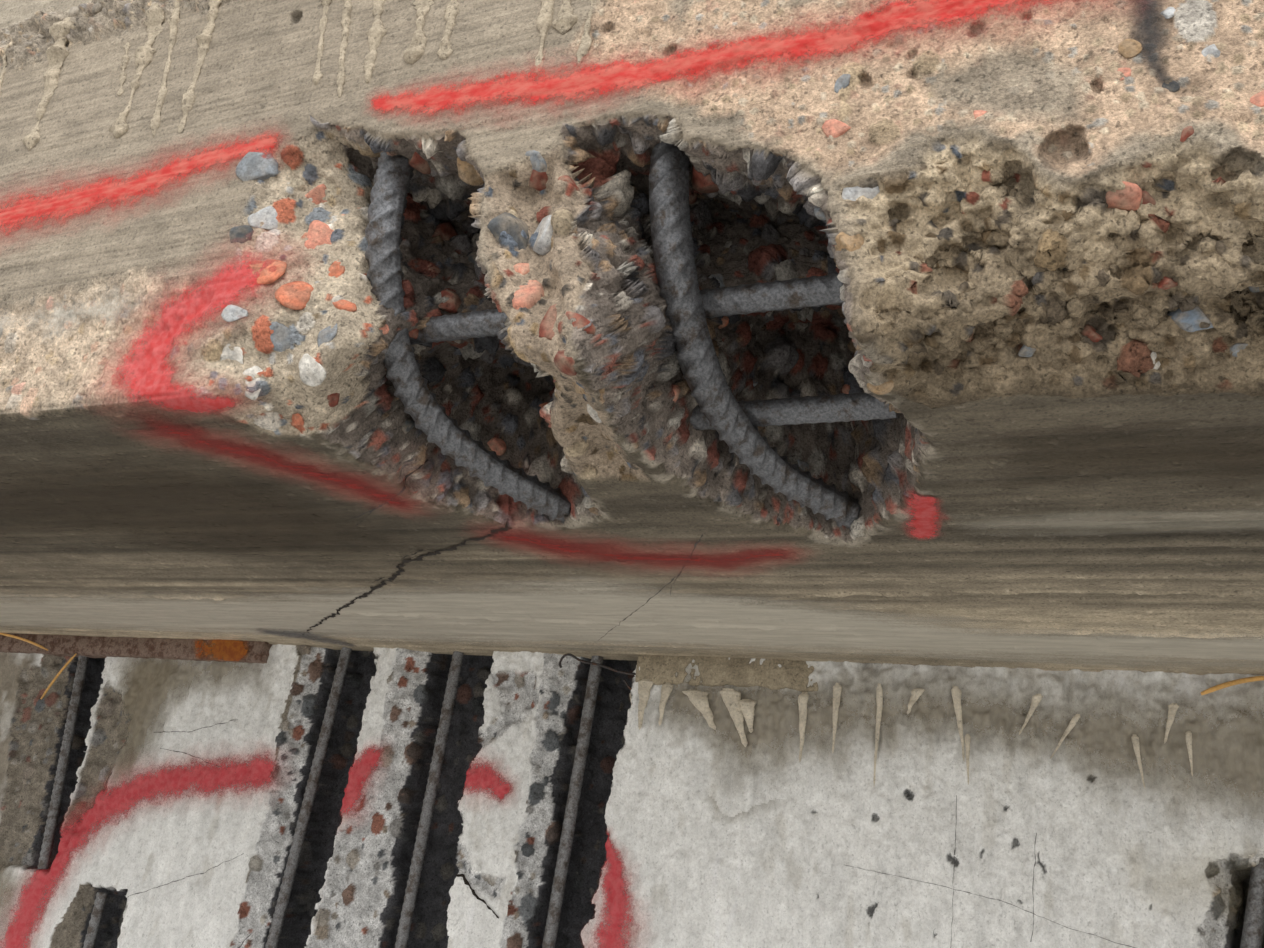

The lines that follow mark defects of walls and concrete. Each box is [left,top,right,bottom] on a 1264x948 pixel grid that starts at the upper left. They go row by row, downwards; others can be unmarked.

spalling [0,264,213,421]
spalling [164,0,1264,543]
crack [302,523,512,635]
spalling [0,664,48,840]
spalling [83,892,108,948]
spalling [265,647,352,948]
spalling [307,805,364,948]
spalling [395,651,464,948]
spalling [456,842,505,899]
spalling [477,670,540,753]
spalling [542,656,603,948]
leakage [669,675,1264,807]